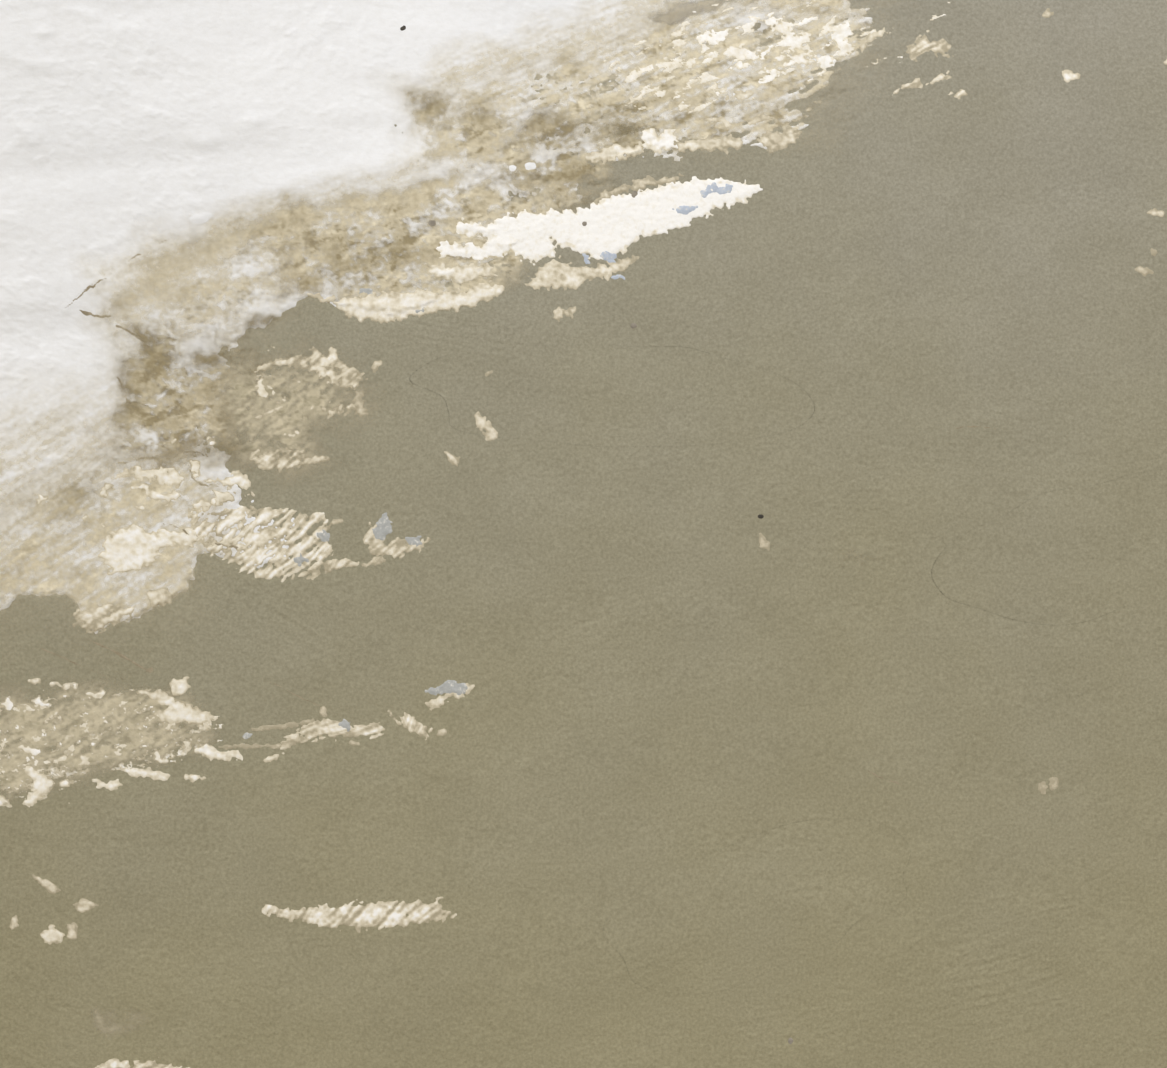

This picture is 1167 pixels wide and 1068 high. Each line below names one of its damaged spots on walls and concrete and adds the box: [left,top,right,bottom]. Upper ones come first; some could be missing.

peeling [893,30,968,99]
peeling [585,114,802,165]
peeling [307,173,763,324]
peeling [253,347,382,419]
peeling [98,426,431,582]
peeling [137,676,214,727]
peeling [181,706,447,762]
peeling [0,745,90,808]
peeling [92,750,170,791]
peeling [40,898,99,945]
peeling [262,897,457,933]
peeling [95,1057,190,1068]